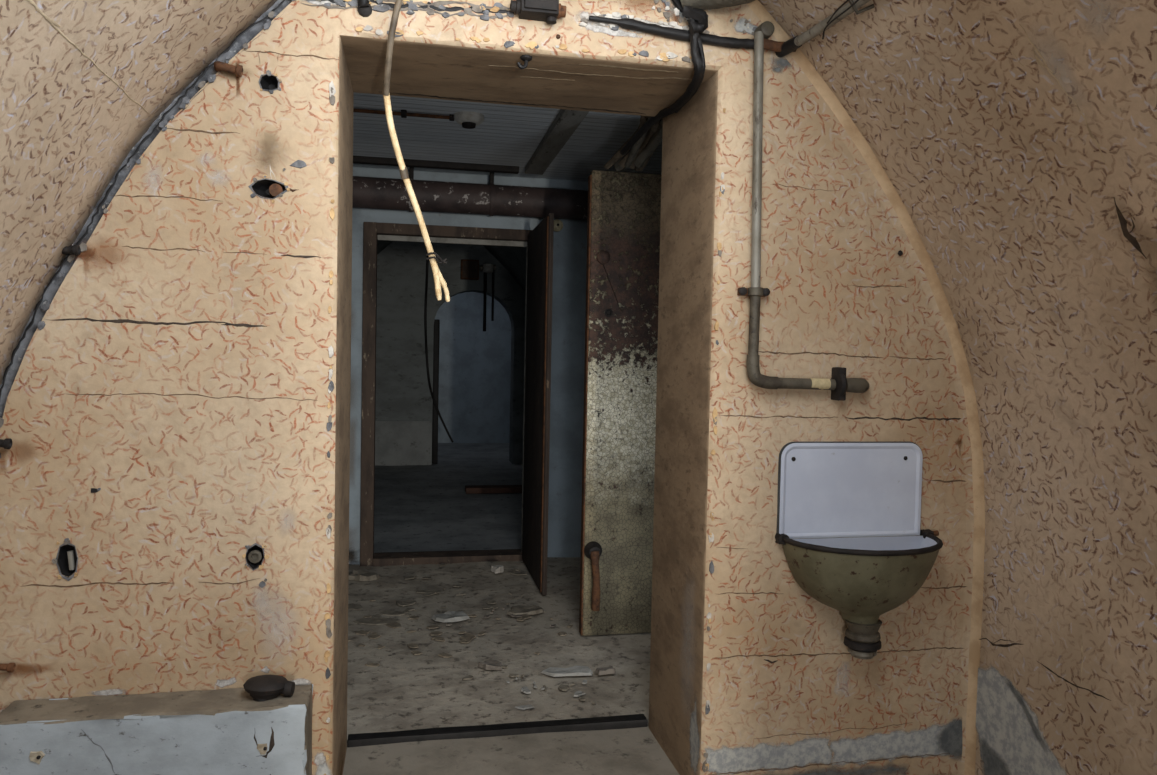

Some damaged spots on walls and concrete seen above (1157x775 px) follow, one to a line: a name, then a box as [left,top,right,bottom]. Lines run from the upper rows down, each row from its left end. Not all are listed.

crack [0,0,339,458]
crack [1114,198,1147,259]
crack [759,351,947,360]
crack [26,580,167,588]
water stain [976,667,1066,775]